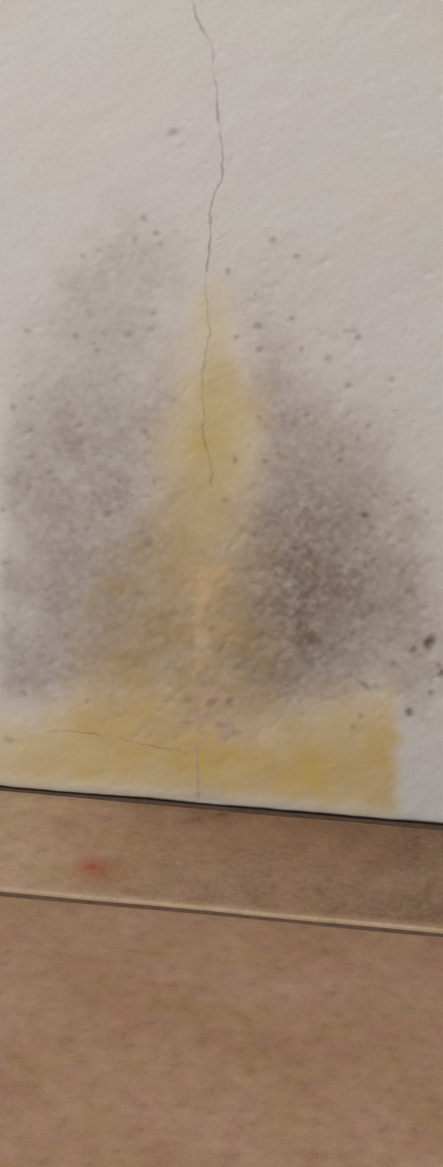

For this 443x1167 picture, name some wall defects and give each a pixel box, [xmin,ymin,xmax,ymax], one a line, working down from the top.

crack [206,154,223,272]
water stain [0,286,443,806]